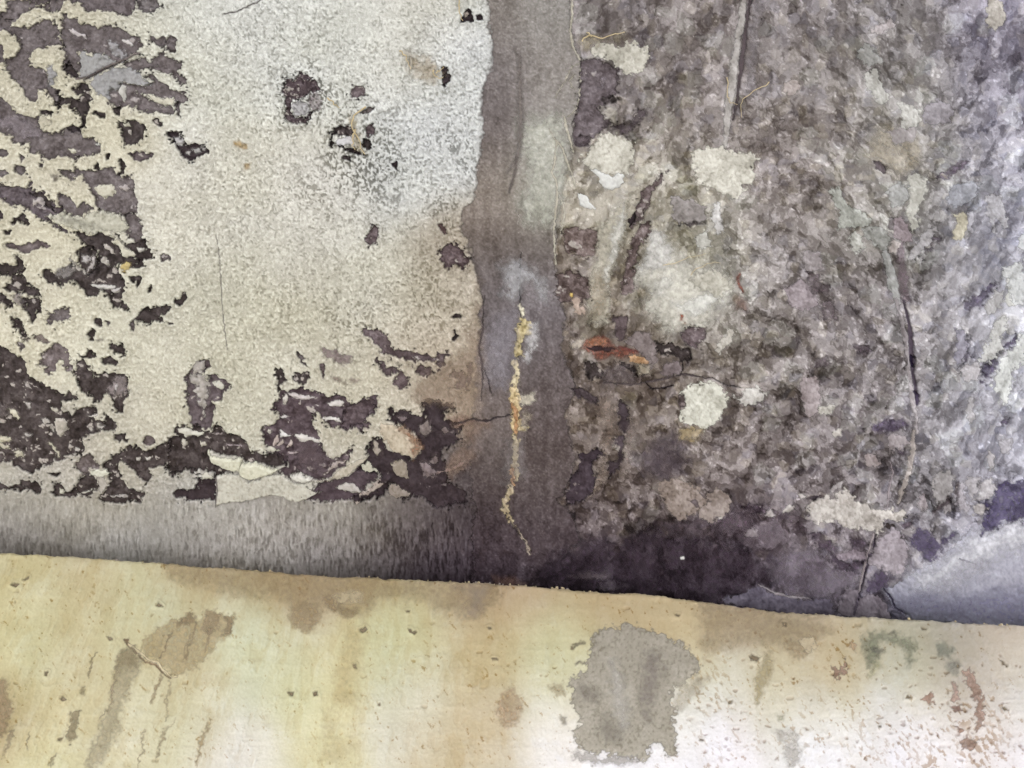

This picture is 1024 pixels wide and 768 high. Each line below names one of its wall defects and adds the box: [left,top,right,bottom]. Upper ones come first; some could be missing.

damp [522,116,565,223]
peeling [0,0,472,510]
crack [458,252,544,555]
corrosion [571,335,650,374]
damp [244,574,385,632]
damp [534,505,889,604]
damp [0,680,14,750]
damp [66,710,80,745]
damp [87,649,141,768]